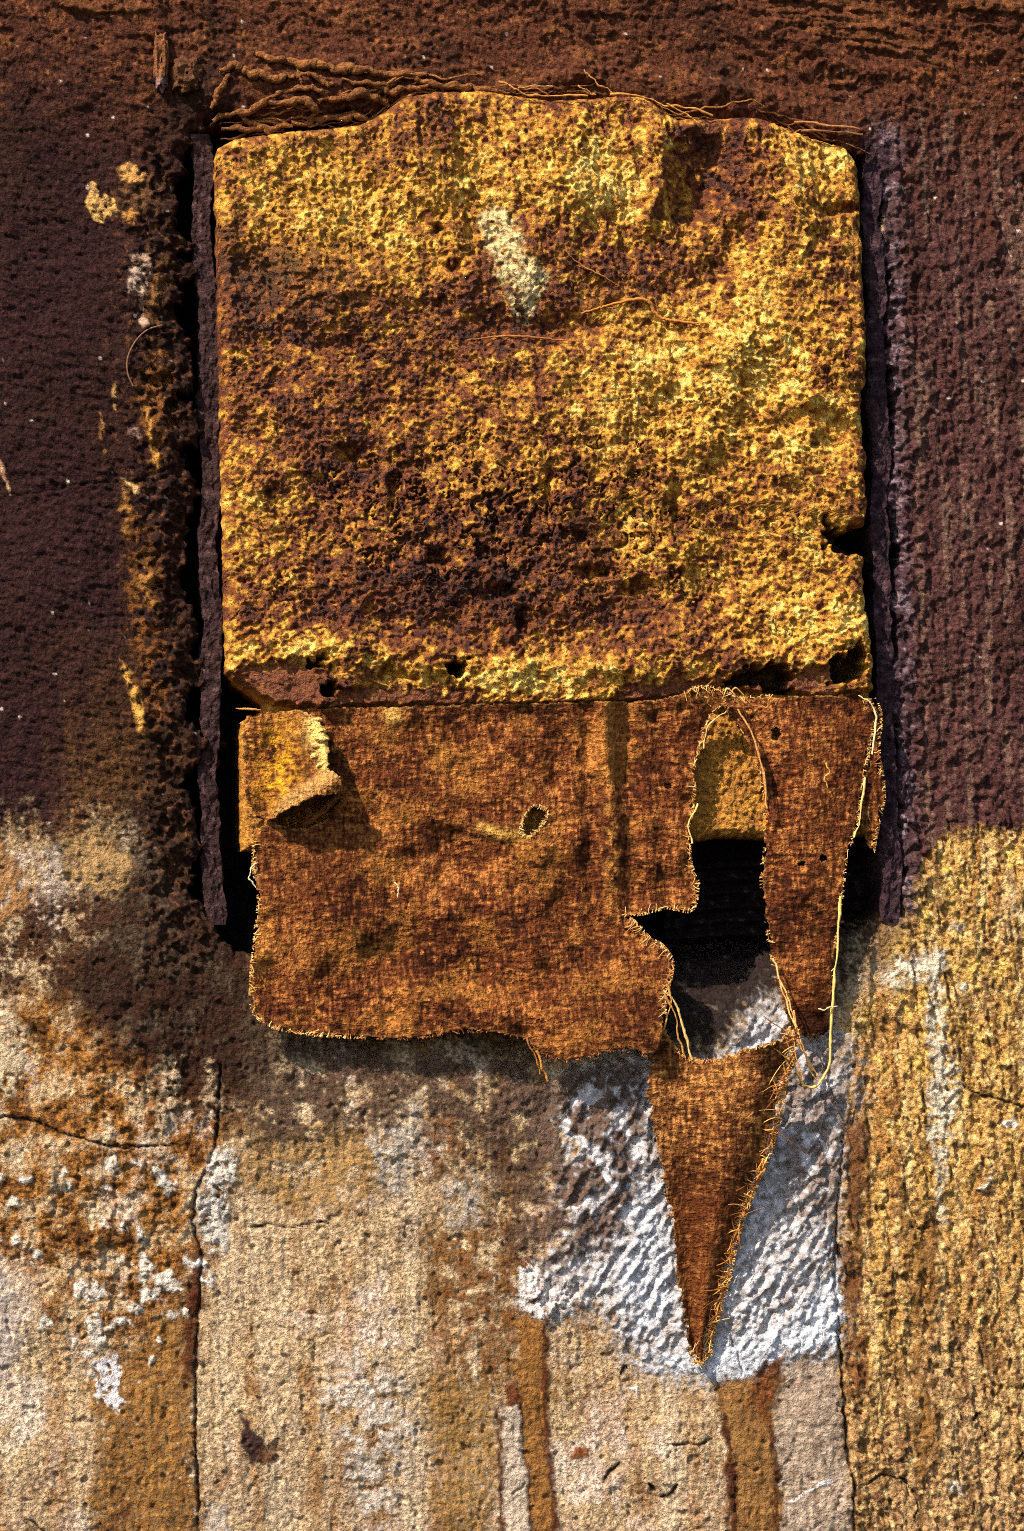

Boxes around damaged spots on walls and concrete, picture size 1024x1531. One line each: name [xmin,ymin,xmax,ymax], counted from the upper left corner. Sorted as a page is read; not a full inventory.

crack [6,1115,170,1150]
crack [192,1063,222,1529]
flaking render [517,987,861,1531]